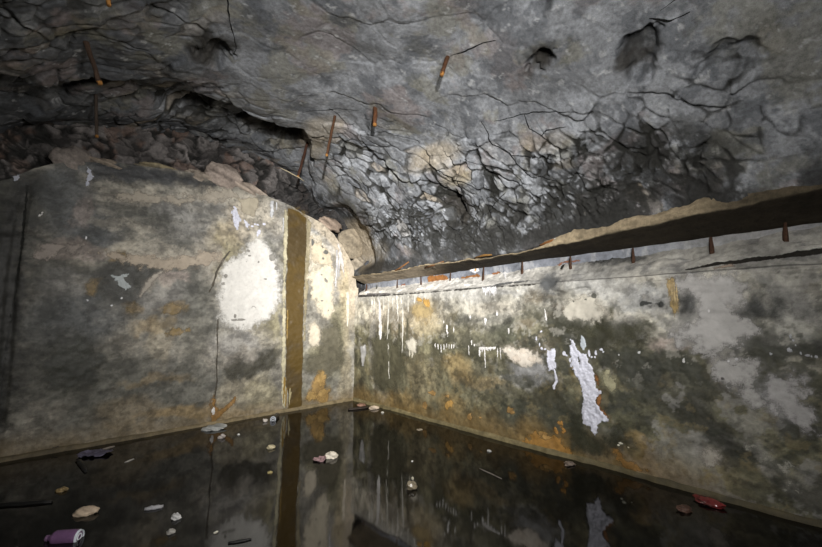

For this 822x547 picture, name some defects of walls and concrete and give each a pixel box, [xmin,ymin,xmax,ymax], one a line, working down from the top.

crack [649,0,690,23]
crack [481,111,577,181]
crack [685,248,822,270]
rust [281,209,330,408]
damp [224,350,277,379]
damp [360,295,415,391]
spalling [406,338,417,357]
damp [468,340,501,368]
spalling [503,346,546,383]
damp [535,316,649,457]
peeling [595,370,617,417]
rust [522,421,572,454]